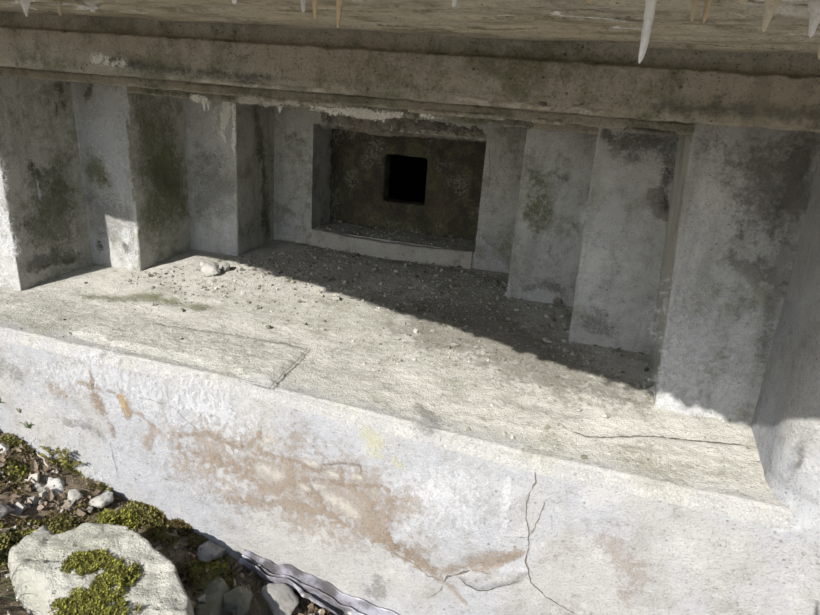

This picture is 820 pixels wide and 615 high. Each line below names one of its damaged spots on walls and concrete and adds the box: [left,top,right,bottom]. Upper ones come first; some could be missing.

water stain [551,11,642,29]
water stain [28,250,80,273]
crack [561,421,740,445]
water stain [48,353,520,574]
crack [374,474,573,613]